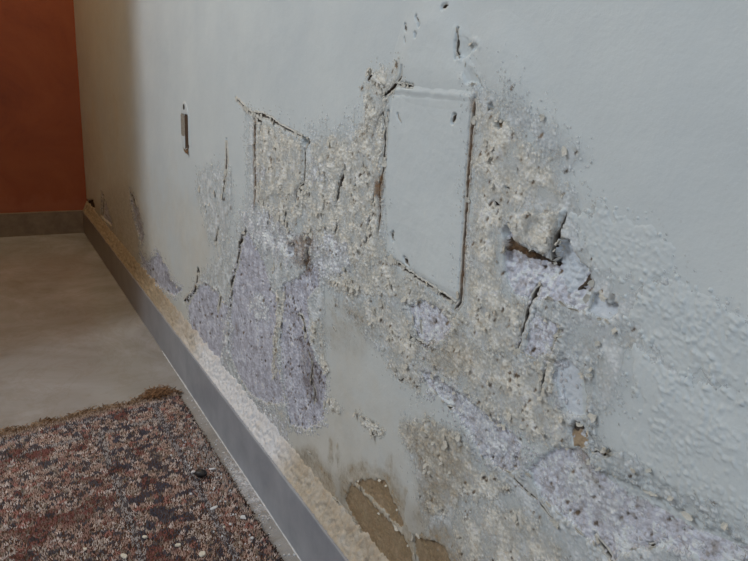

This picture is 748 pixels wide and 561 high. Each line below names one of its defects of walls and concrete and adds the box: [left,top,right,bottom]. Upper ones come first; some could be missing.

peeling [128,186,231,358]
peeling [277,231,330,436]
crack [235,71,414,247]
crack [387,98,478,312]
crack [513,282,543,358]
crack [550,212,568,261]
peeling [399,223,748,561]
peeling [346,479,450,561]